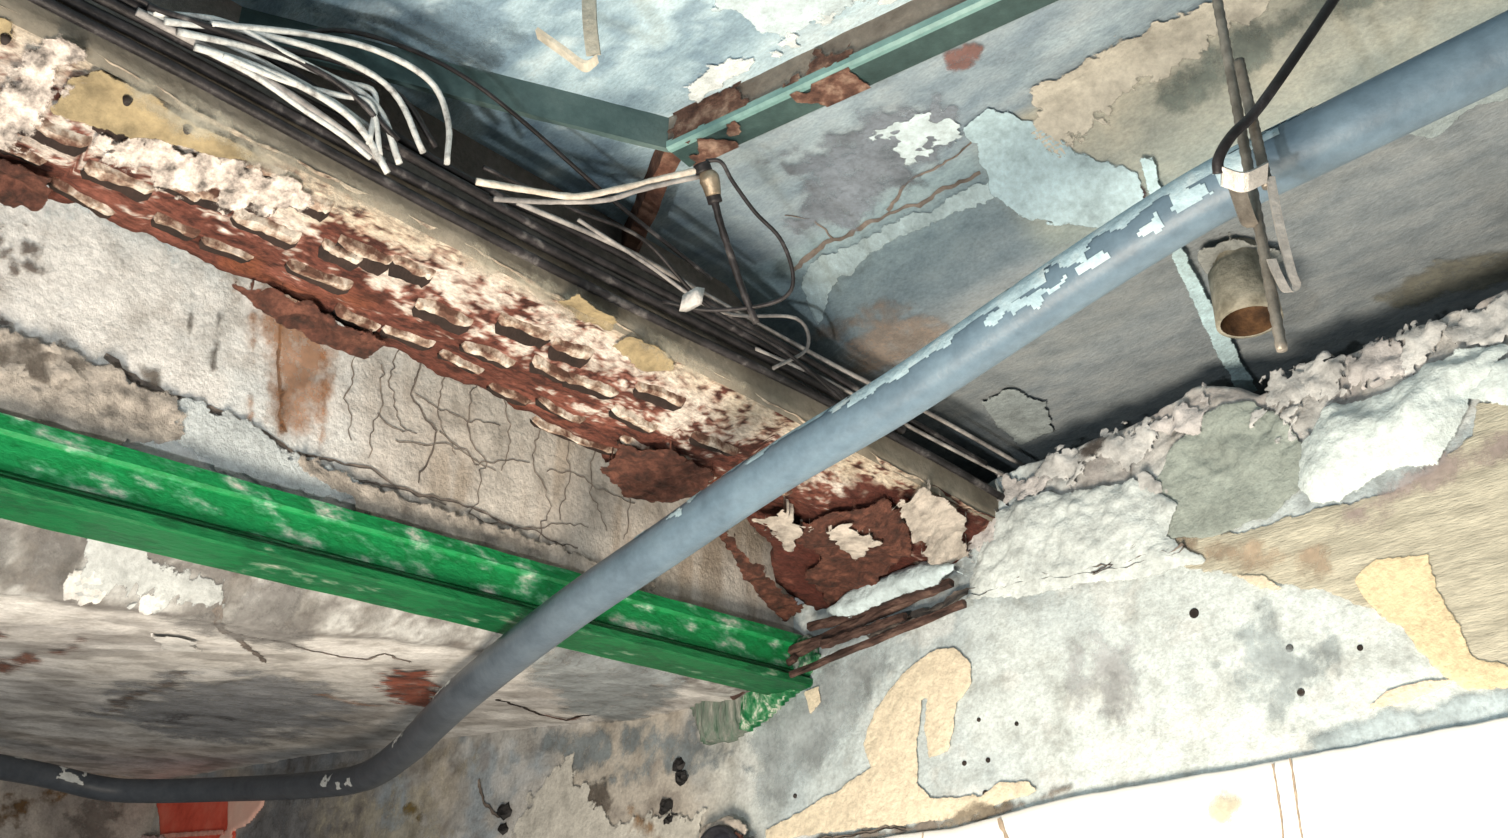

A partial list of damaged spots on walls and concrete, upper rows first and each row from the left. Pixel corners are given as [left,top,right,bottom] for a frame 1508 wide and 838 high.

rust [0,159,53,212]
rust [232,278,386,433]
spalling [0,328,597,574]
crack [103,343,635,549]
rust [600,441,714,503]
peeling [892,292,1508,667]
peeling [63,538,226,615]
rust [719,494,912,622]
peeling [752,496,883,561]
rust [0,641,83,673]
peeling [150,633,203,652]
rust [352,670,442,707]